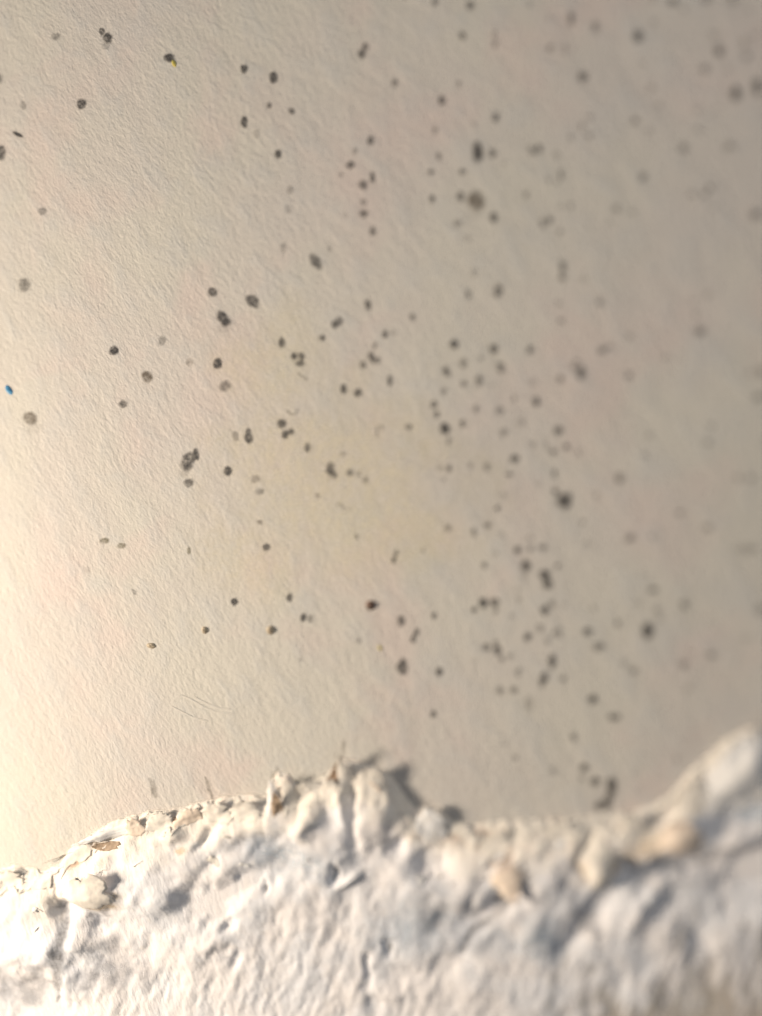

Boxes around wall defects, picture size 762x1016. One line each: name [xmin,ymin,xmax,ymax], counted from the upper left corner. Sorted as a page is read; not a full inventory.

damp [473,143,496,161]
damp [182,449,198,485]
damp [514,547,559,588]
damp [643,623,653,638]
peeling [0,727,762,909]
damp [0,726,762,1016]